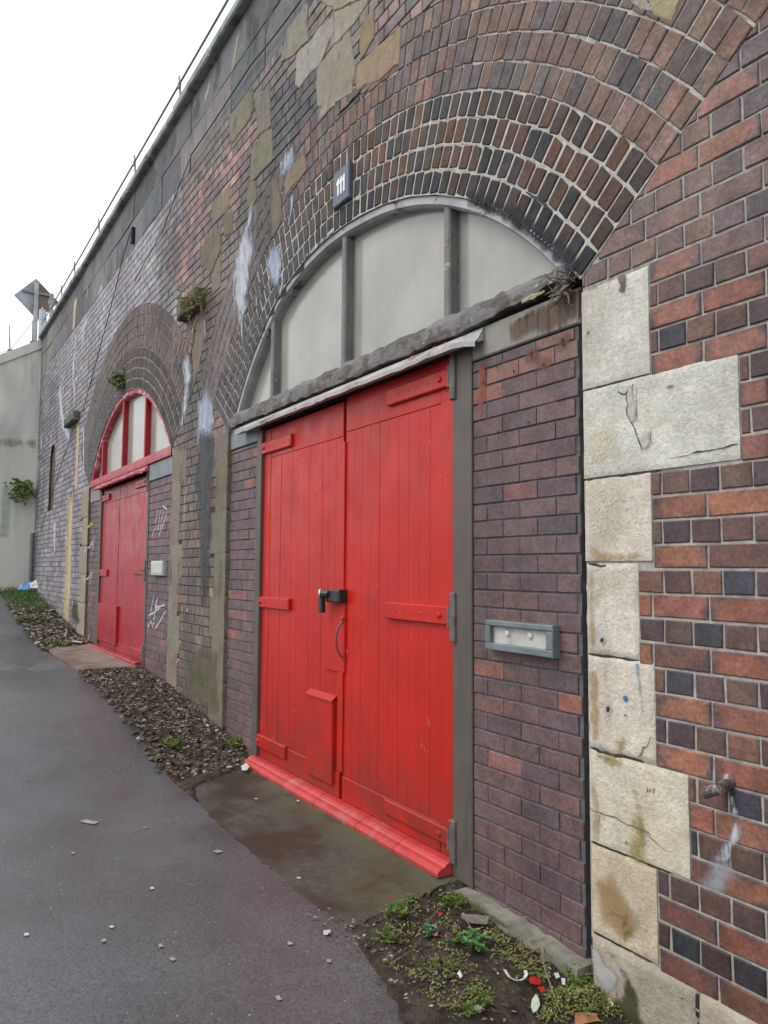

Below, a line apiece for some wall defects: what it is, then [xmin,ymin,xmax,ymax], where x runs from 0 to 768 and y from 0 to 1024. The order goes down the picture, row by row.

leakage [233,206,257,342]
leakage [267,247,283,295]
rust [510,289,581,350]
crack [618,385,737,459]
crack [591,809,665,851]
leakage [710,797,739,889]